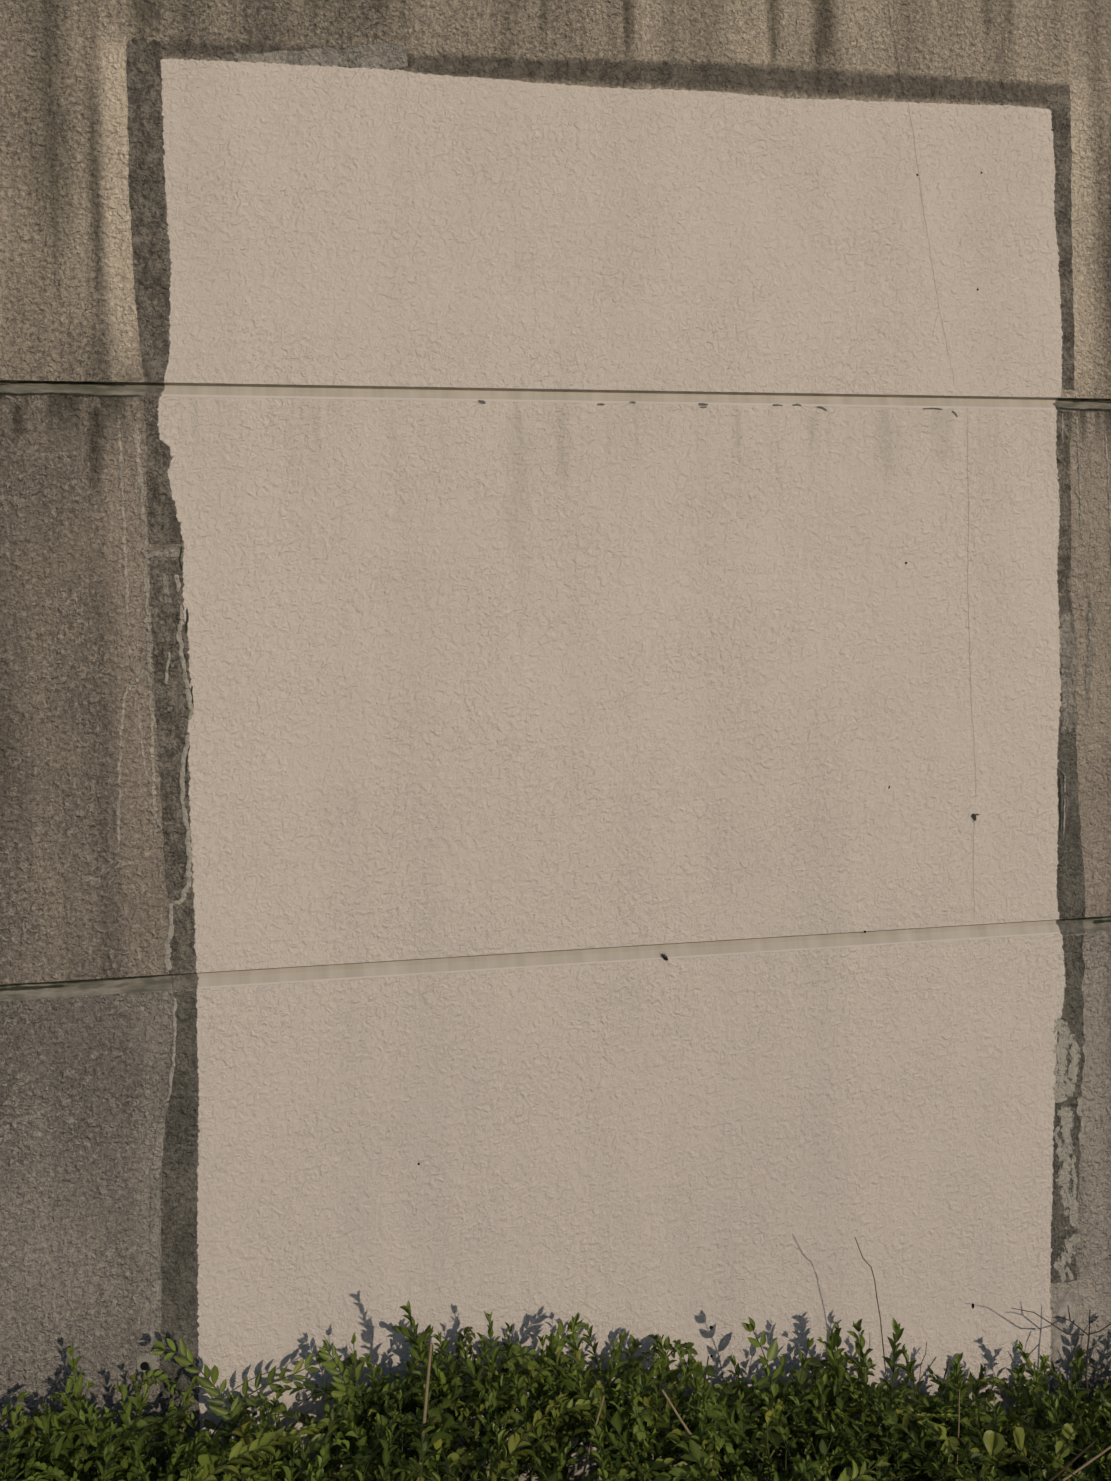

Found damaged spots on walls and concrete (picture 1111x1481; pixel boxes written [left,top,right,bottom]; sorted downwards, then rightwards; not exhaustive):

damp [126,36,1075,389]
damp [117,388,200,1454]
peeling [1050,935,1085,1283]
damp [1056,399,1111,935]